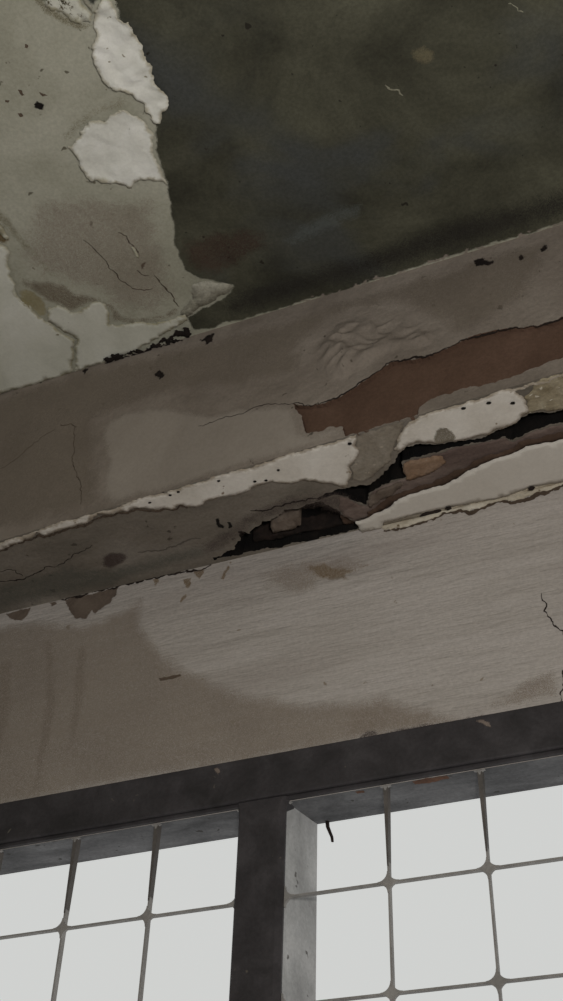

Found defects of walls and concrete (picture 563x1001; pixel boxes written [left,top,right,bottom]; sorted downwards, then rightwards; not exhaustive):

spalling [0,0,563,394]
crack [83,232,178,306]
spalling [0,317,563,551]
peeling [6,607,31,621]
peeling [49,587,119,619]
crack [541,593,563,631]
leakage [0,546,559,803]